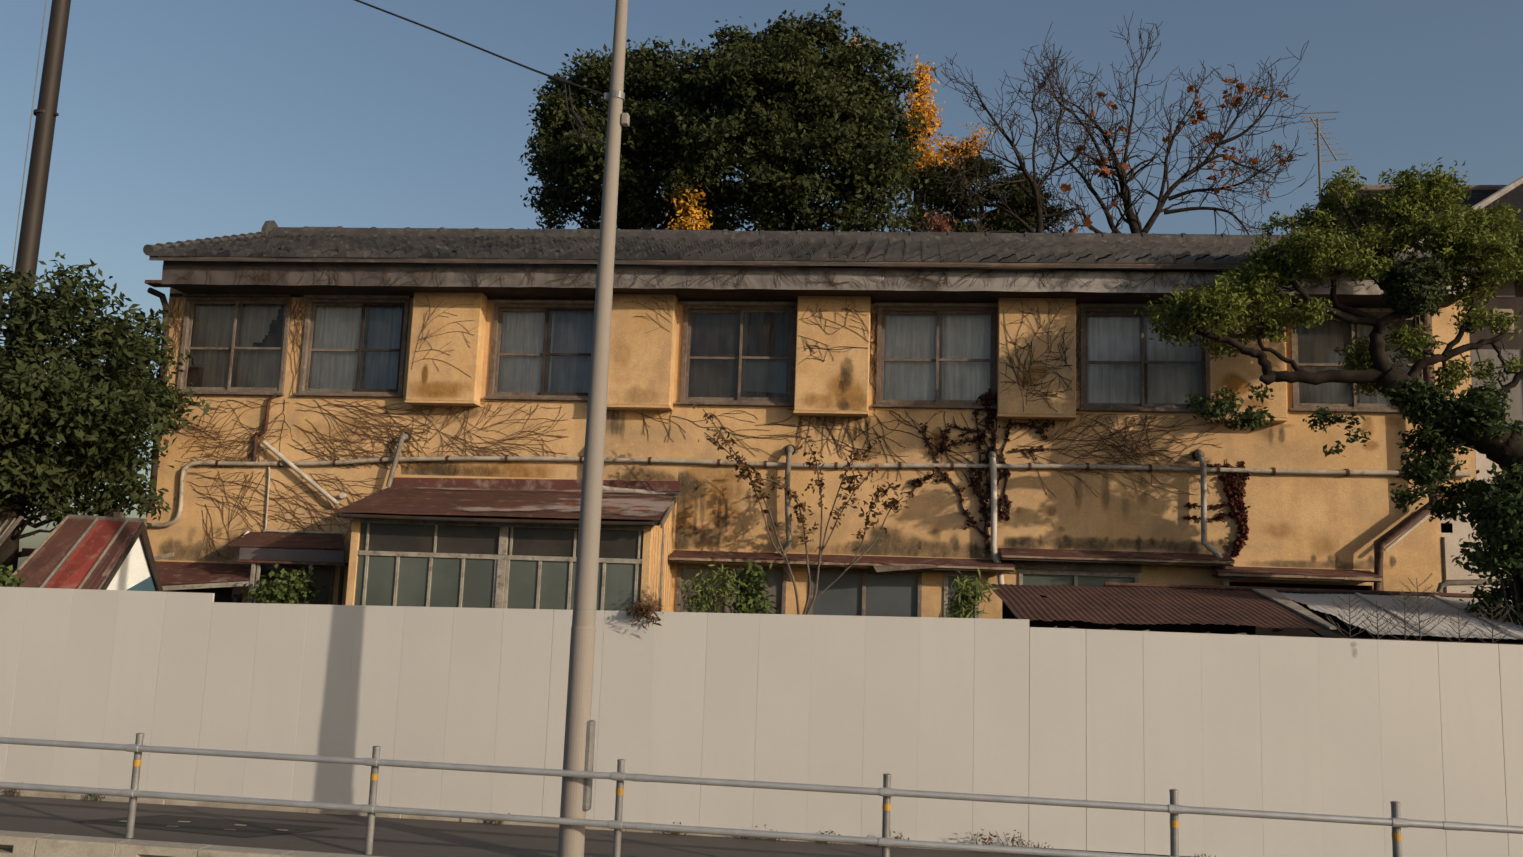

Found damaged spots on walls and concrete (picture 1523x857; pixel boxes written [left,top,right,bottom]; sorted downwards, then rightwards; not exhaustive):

water stain [824,368,869,434]
water stain [405,461,459,476]
water stain [675,474,733,549]
water stain [853,527,988,558]
water stain [1006,536,1235,554]